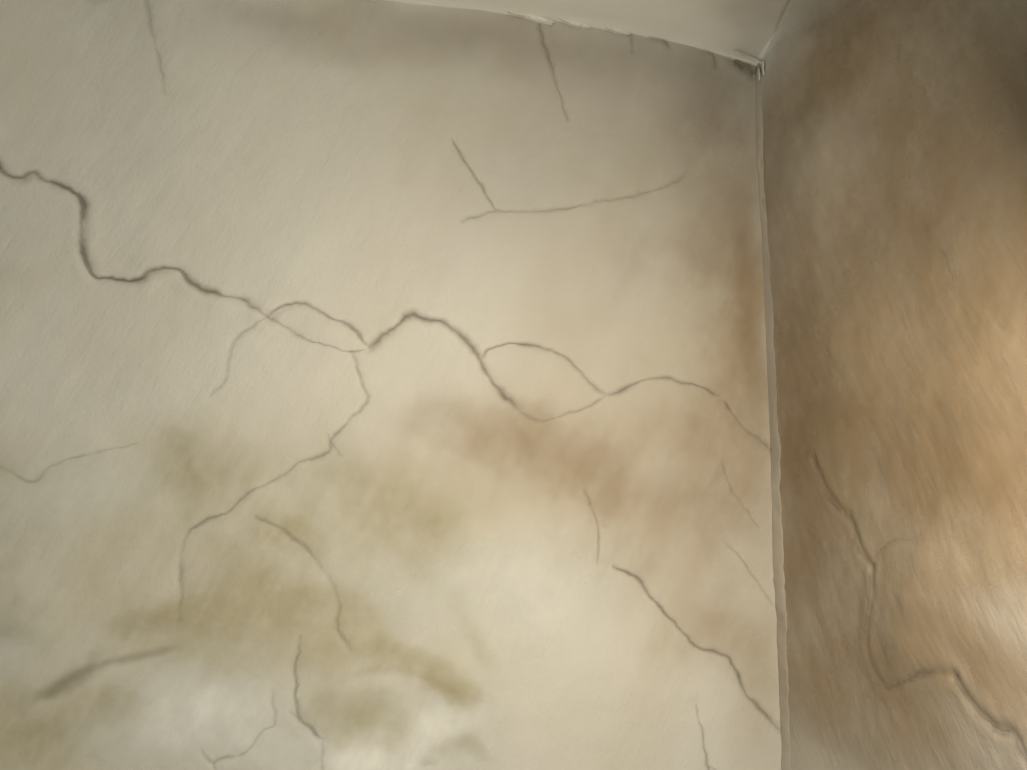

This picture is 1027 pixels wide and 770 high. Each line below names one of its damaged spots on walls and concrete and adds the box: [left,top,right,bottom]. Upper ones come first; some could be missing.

crack [734,59,755,74]
crack [0,166,220,294]
crack [377,313,486,370]
water stain [776,47,1027,733]
crack [621,569,741,682]
water stain [99,671,486,770]